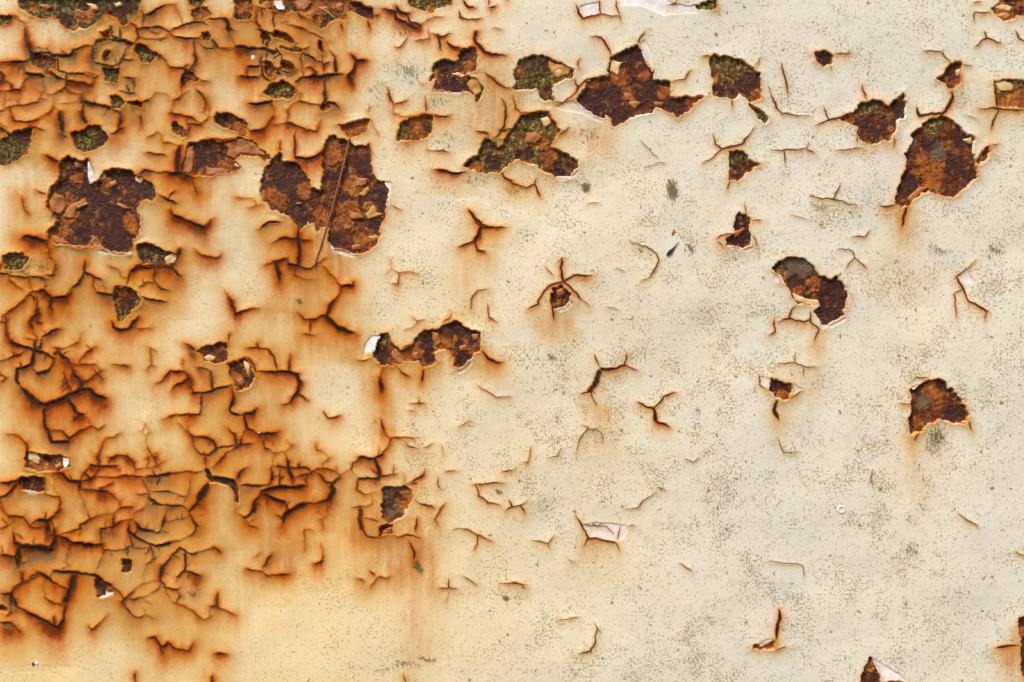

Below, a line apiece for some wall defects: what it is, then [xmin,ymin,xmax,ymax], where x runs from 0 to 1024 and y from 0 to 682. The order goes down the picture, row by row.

rust [407,0,453,13]
rust [0,0,391,358]
rust [397,113,452,147]
rust [25,371,61,400]
rust [0,430,153,553]
rust [24,540,159,618]
rust [167,340,328,587]
crack [0,0,506,682]
rust [345,472,445,587]
rust [358,315,504,447]
crack [437,354,637,514]
peeling [575,515,633,550]